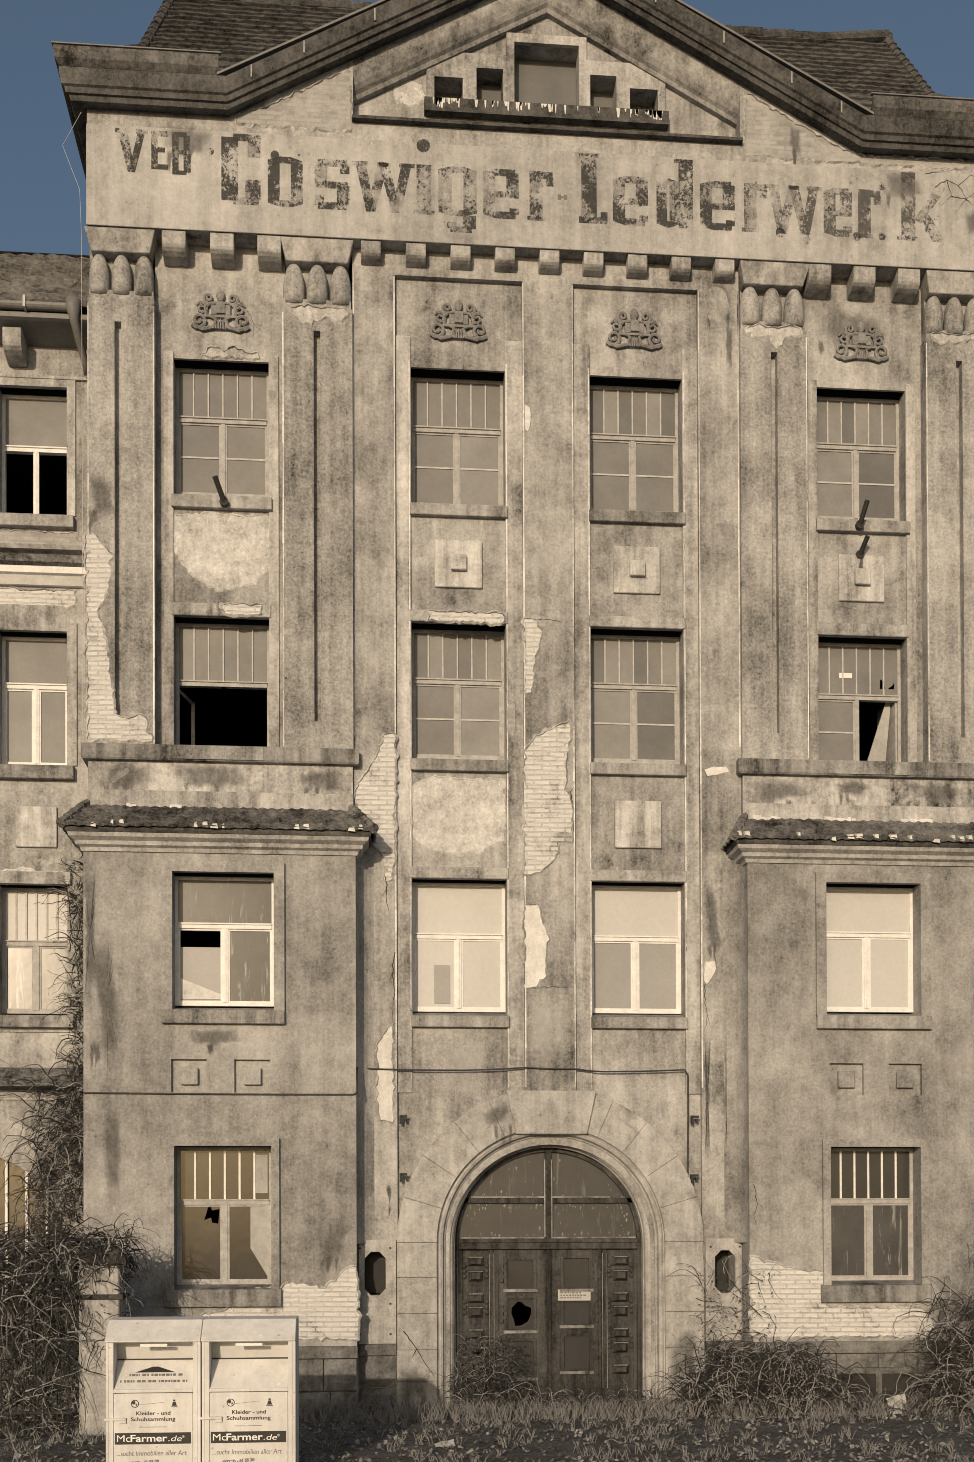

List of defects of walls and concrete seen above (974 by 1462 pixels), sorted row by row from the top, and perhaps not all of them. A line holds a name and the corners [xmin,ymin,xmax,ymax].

crack [928,169,973,214]
peeling [0,528,155,744]
flaking render [353,609,574,882]
peeling [522,902,551,989]
peeling [374,1023,396,1124]
peeling [199,1265,363,1343]
peeling [747,1255,936,1341]